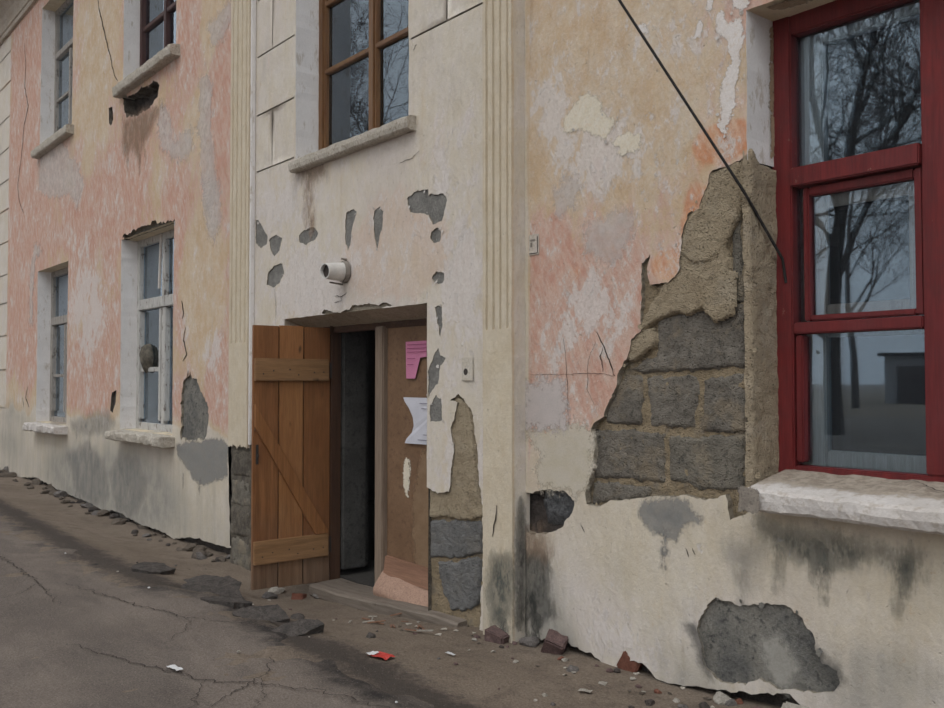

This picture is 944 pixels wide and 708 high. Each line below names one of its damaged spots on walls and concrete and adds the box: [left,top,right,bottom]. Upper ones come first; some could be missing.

crack [98,1,118,81]
spalling [109,81,159,125]
peeling [691,0,750,138]
spalling [123,219,175,241]
peeling [255,220,284,288]
peeling [345,209,357,249]
peeling [407,189,447,243]
spalling [525,27,779,535]
spalling [180,373,209,442]
spalling [426,349,483,628]
leakage [638,497,701,556]
spalling [697,597,840,696]